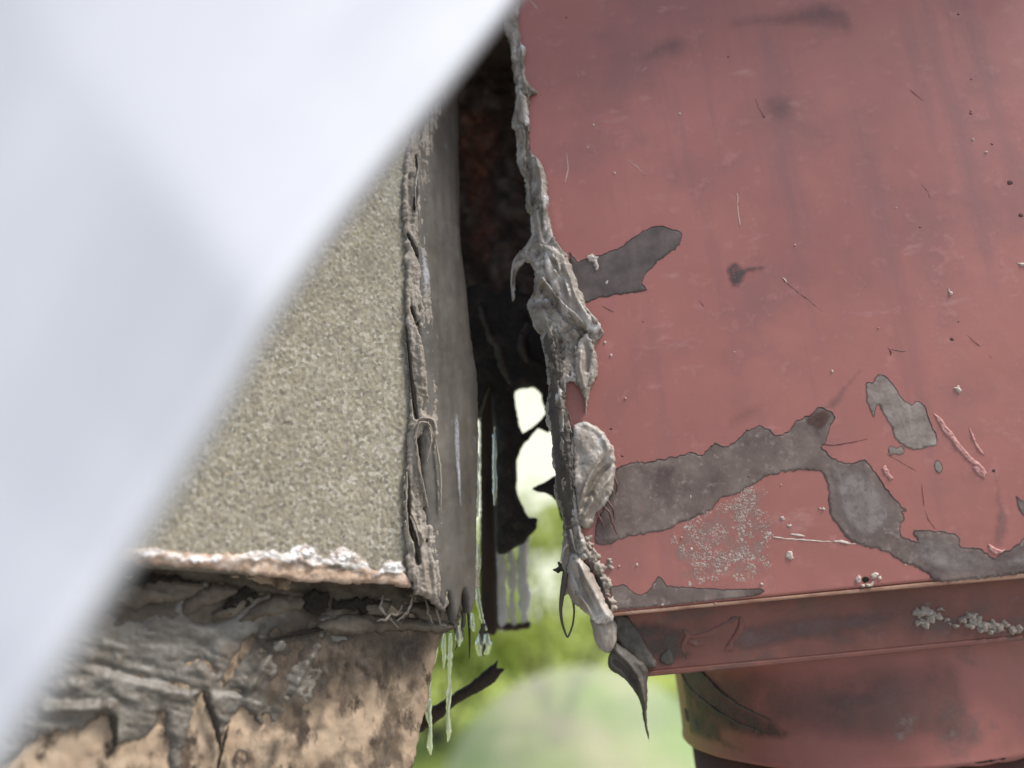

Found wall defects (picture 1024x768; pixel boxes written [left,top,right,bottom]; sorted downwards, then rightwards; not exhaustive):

peeling [569,225,682,303]
peeling [595,374,1024,582]
efflorescence [141,544,404,576]
spalling [136,548,412,588]
peeling [609,576,764,610]
hole [855,572,882,587]